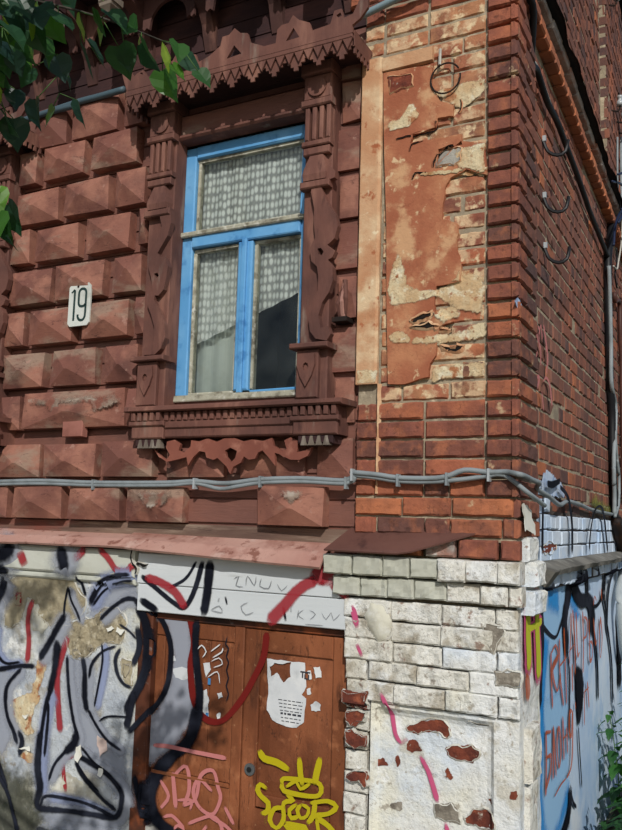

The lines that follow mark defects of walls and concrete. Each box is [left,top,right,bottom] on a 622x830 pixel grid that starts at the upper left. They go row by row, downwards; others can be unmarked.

peeling [434,80,485,108]
peeling [415,143,487,177]
peeling [387,255,487,382]
peeling [2,576,128,661]
flaking render [120,657,135,686]
peeling [10,659,47,736]
spalling [341,688,370,749]
peeling [19,746,34,763]
spalling [346,768,370,788]
peeling [378,755,400,767]
spalling [406,717,482,763]
spalling [433,799,496,830]